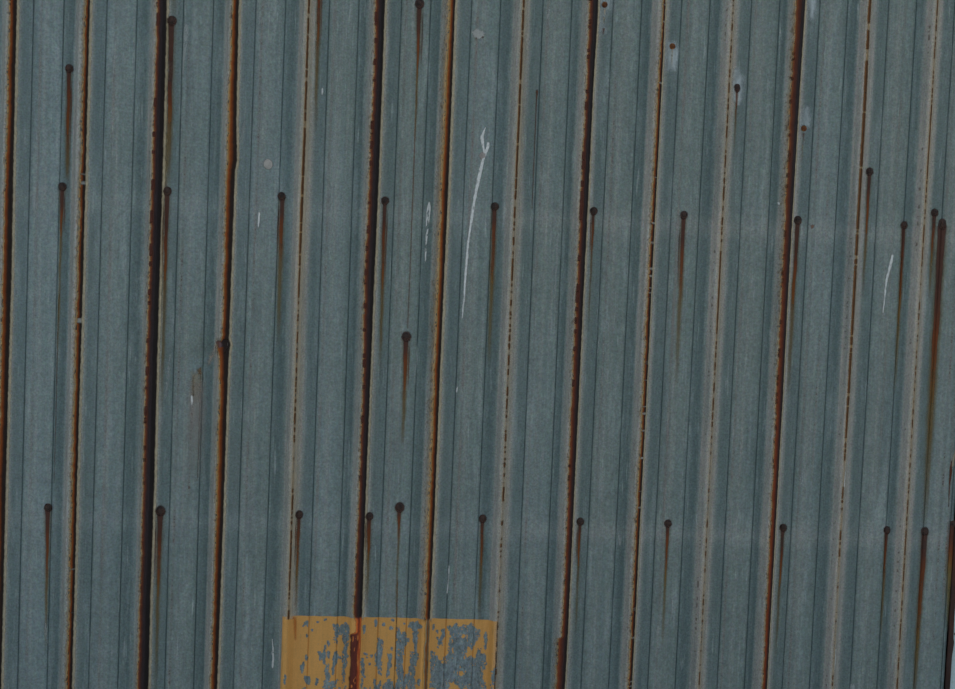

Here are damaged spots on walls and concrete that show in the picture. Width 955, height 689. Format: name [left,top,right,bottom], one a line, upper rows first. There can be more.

corrosion [0,0,20,689]
corrosion [65,0,92,689]
corrosion [136,0,177,689]
corrosion [209,0,241,689]
peeling [300,618,350,689]
corrosion [349,0,389,689]
peeling [360,619,497,689]
corrosion [422,0,457,689]
corrosion [555,0,600,689]
corrosion [627,0,667,689]
corrosion [762,0,814,689]
corrosion [896,0,947,689]